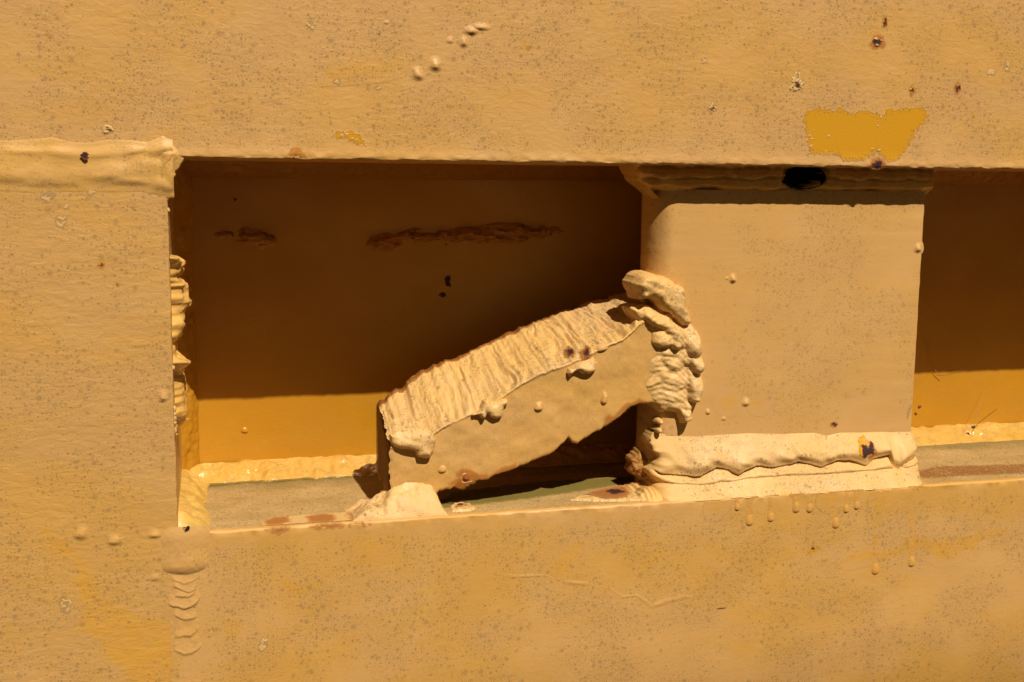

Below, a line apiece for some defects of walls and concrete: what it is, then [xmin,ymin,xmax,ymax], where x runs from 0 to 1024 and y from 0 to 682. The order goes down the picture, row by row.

corrosion [870,17,887,49]
peeling [802,106,928,163]
corrosion [376,295,615,491]
corrosion [858,435,877,459]
peeling [571,485,646,502]